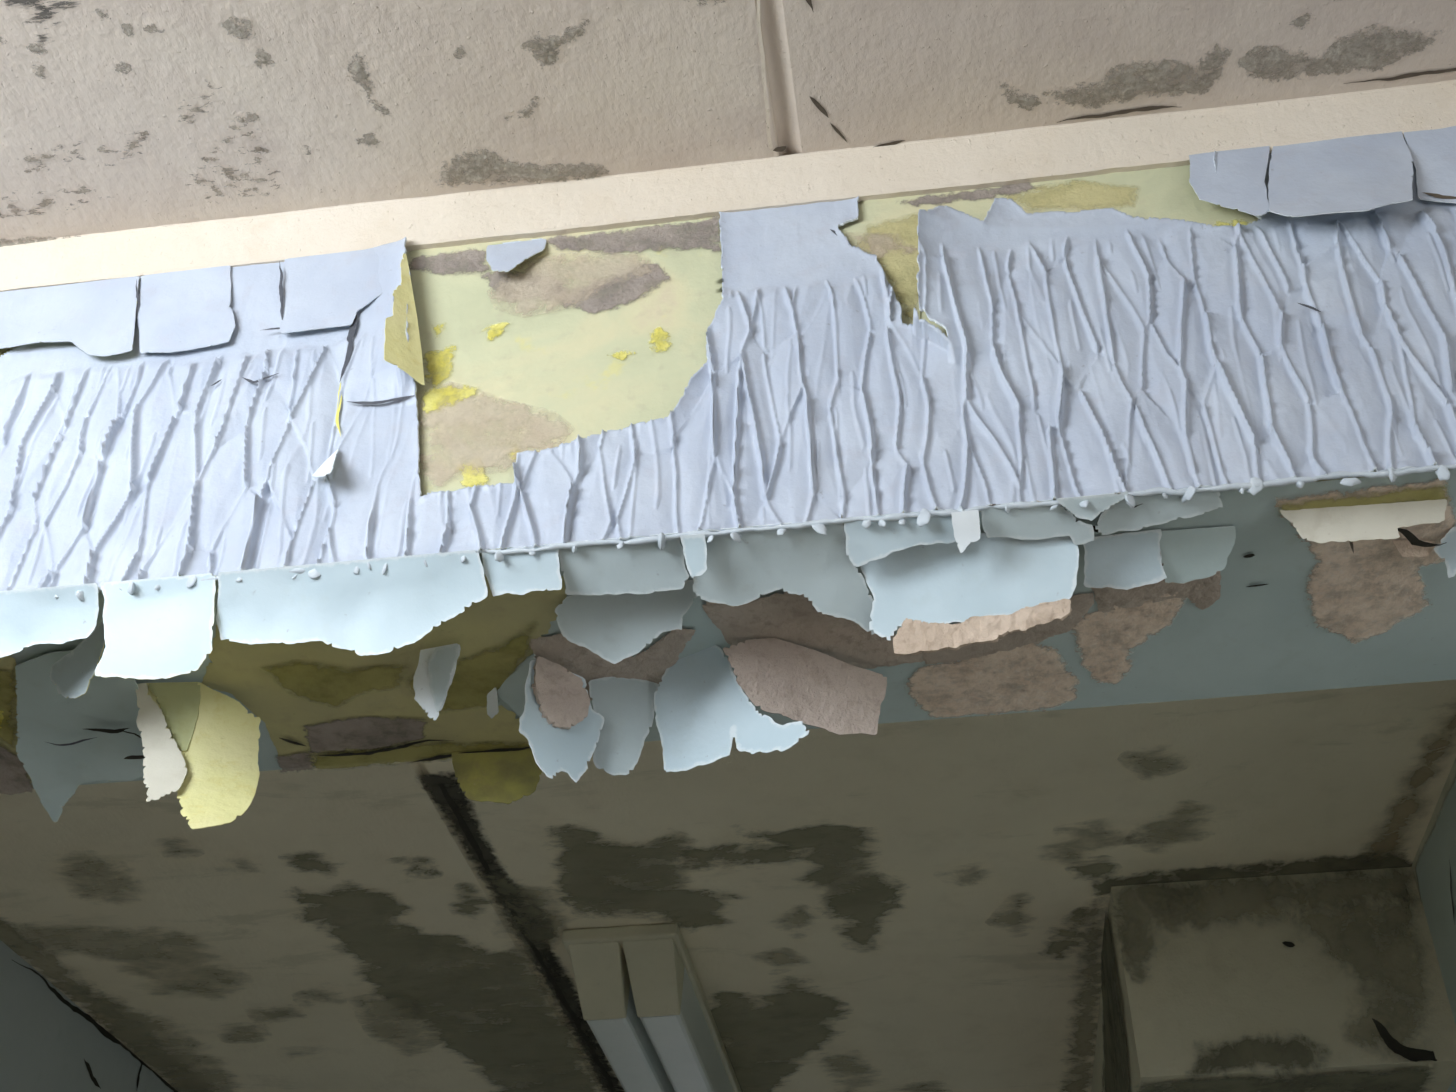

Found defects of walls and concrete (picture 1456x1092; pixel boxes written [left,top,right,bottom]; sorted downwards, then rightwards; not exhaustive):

damp [6,0,75,42]
peeling [0,266,236,357]
peeling [279,216,723,495]
peeling [840,126,1456,325]
peeling [0,487,1236,830]
flaking render [1275,479,1456,644]
damp [1046,715,1456,958]
damp [0,920,233,1092]
damp [290,825,901,1092]
damp [1101,951,1117,1092]